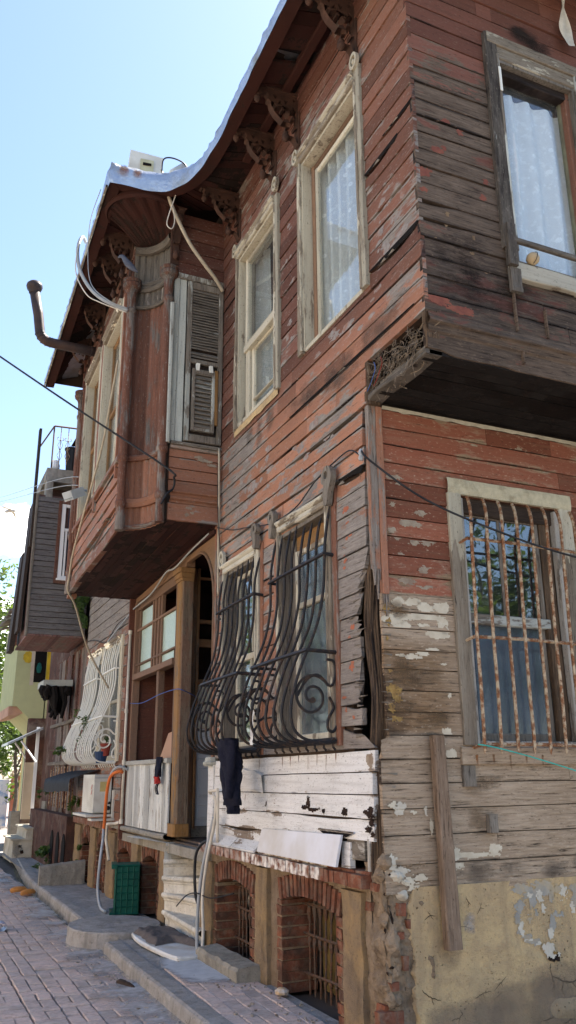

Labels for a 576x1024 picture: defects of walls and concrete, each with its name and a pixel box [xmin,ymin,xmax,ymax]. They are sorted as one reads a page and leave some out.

peeling [388,510,436,555]
peeling [381,565,450,660]
flaking render [388,801,434,835]
peeling [454,843,502,871]
spalling [365,853,428,1024]
flaking render [510,880,576,962]